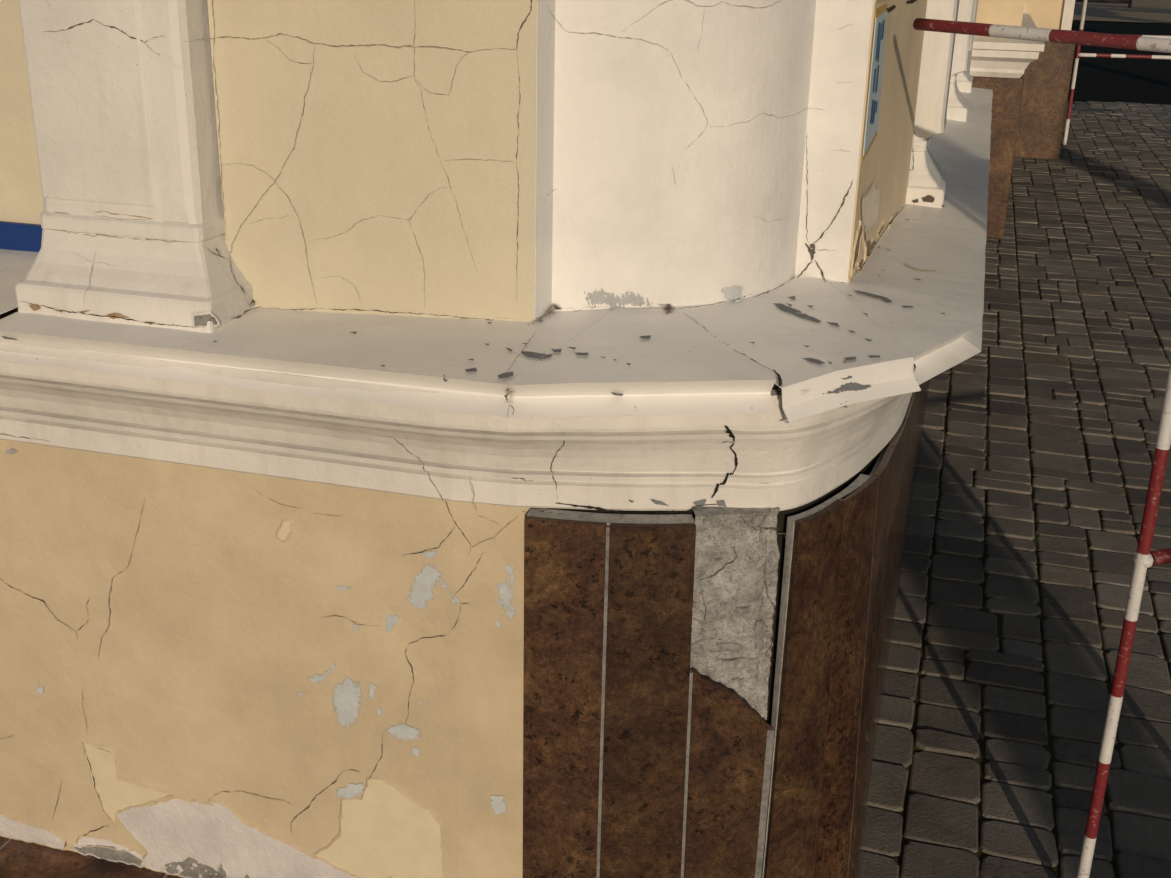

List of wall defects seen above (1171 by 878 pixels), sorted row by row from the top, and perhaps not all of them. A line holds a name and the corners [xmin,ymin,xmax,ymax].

crack [21,0,853,328]
flaking render [849,182,914,308]
peeling [584,289,653,309]
peeling [773,296,872,341]
peeling [507,343,631,365]
peeling [802,345,871,408]
peeling [406,550,459,609]
peeling [495,563,517,628]
crack [214,425,786,856]
peeling [297,664,382,728]
peeling [384,723,422,757]
flaking render [0,739,446,878]